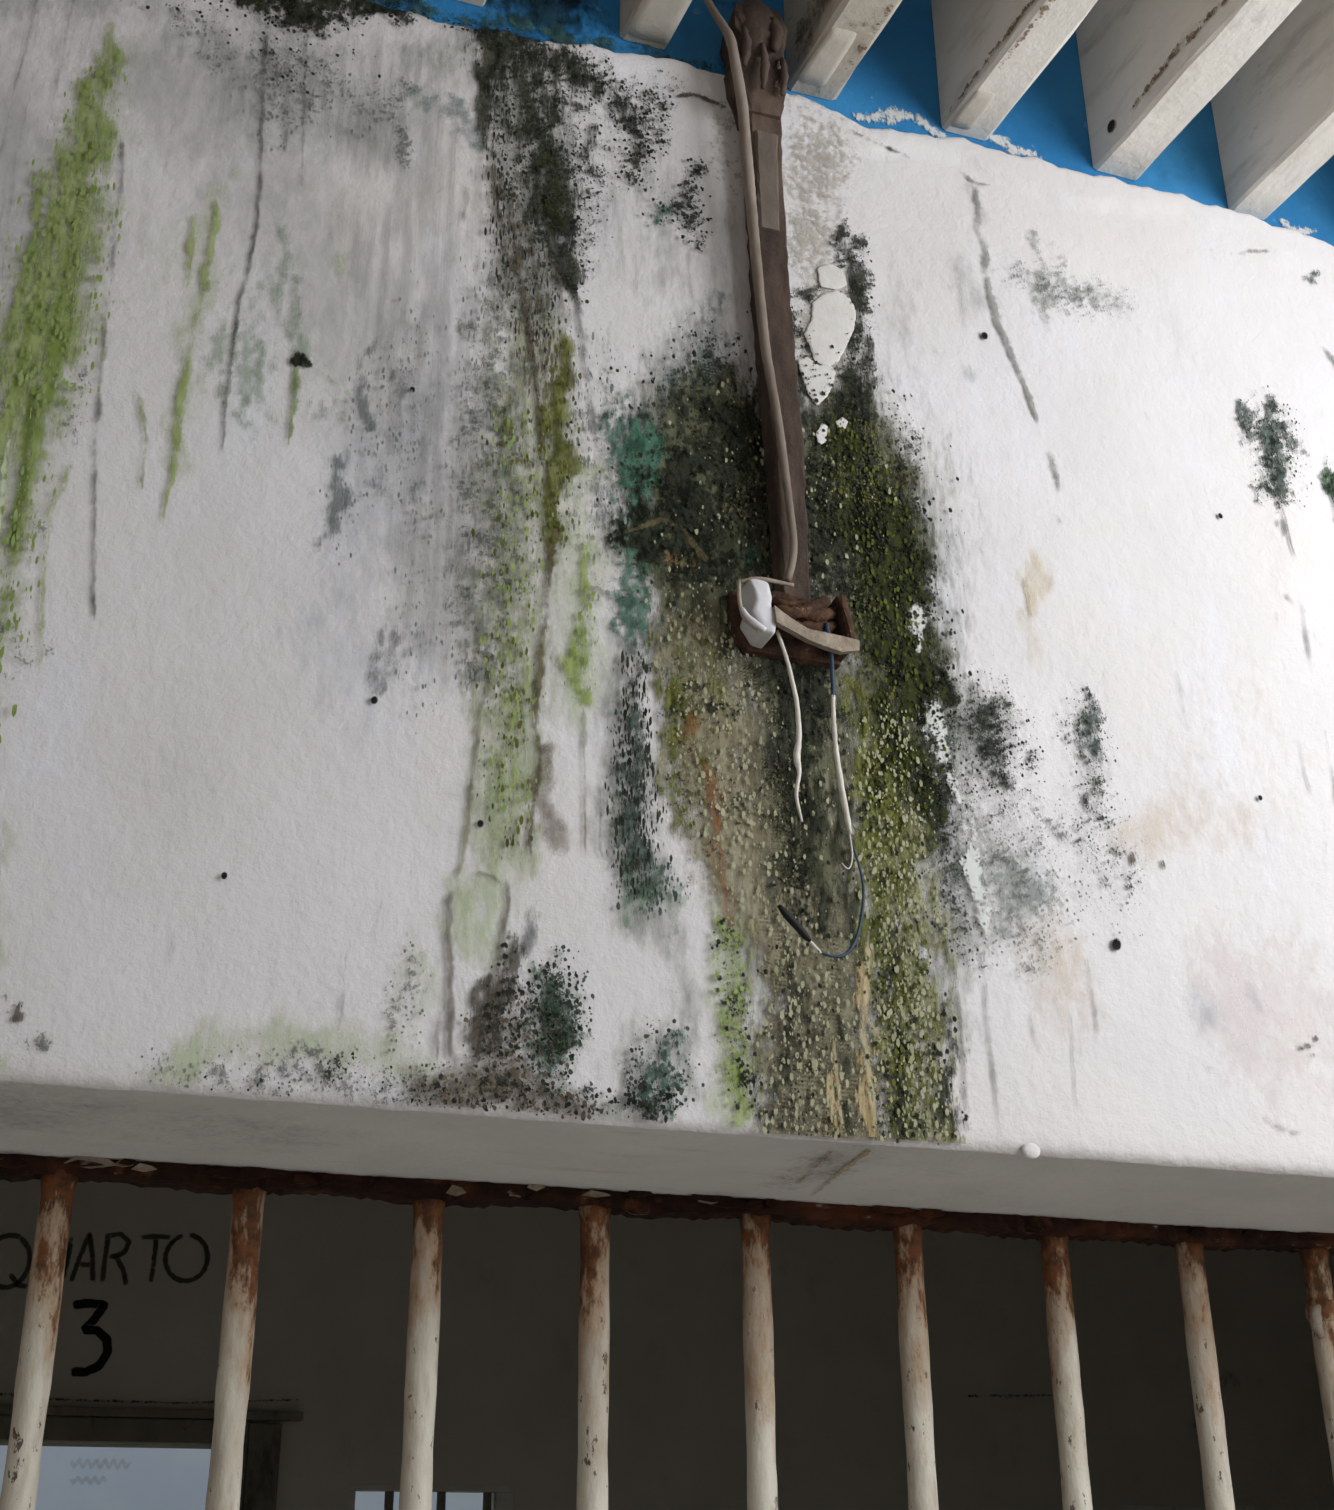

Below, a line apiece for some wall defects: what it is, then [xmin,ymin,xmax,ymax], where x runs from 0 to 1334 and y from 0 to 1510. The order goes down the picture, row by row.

water stain [0,144,92,565]
water stain [146,0,725,874]
water stain [1235,385,1334,552]
water stain [592,228,1165,1145]
water stain [396,872,705,1123]